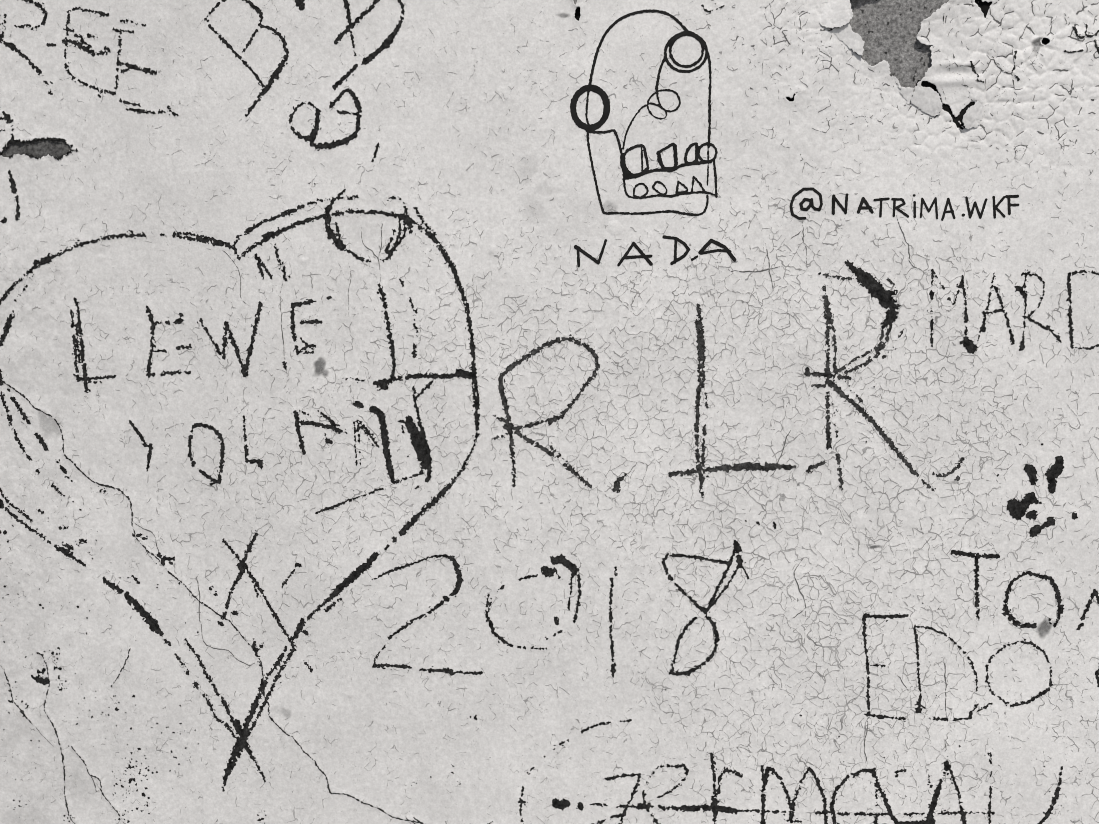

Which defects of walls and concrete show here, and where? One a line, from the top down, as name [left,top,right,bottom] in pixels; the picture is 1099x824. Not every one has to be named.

peeling [975,0,992,18]
peeling [819,0,983,130]
crack [1064,24,1099,54]
spalling [0,137,78,160]
crack [348,224,383,310]
crack [728,245,780,291]
crack [3,381,423,824]
crack [793,560,806,618]
crack [942,663,950,751]